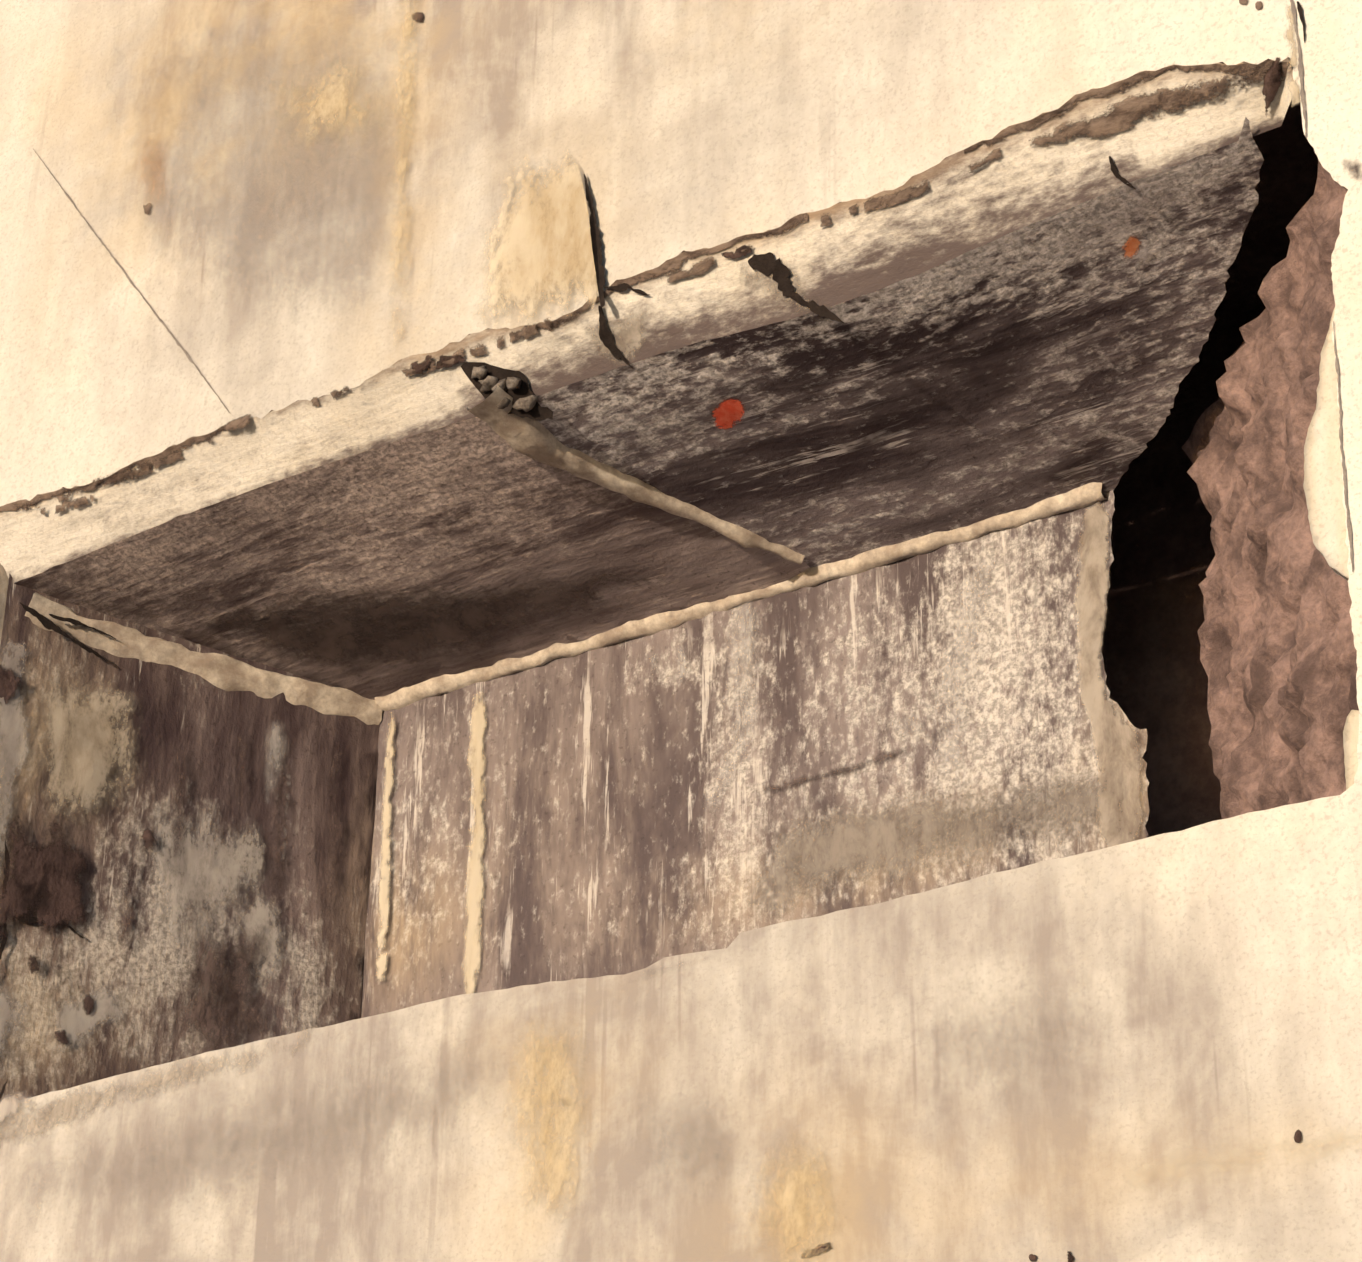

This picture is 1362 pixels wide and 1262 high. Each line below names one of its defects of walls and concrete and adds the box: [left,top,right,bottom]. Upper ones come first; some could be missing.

damp [295,70,362,130]
flaking render [964,58,1290,173]
crack [33,149,230,413]
crack [584,174,650,369]
spalling [402,213,832,421]
flaking render [0,414,251,515]
flaking render [1303,308,1349,581]
peeling [0,642,133,939]
peeling [142,812,278,1041]
damp [376,718,395,980]
damp [463,692,486,994]
flaking render [1343,710,1359,790]